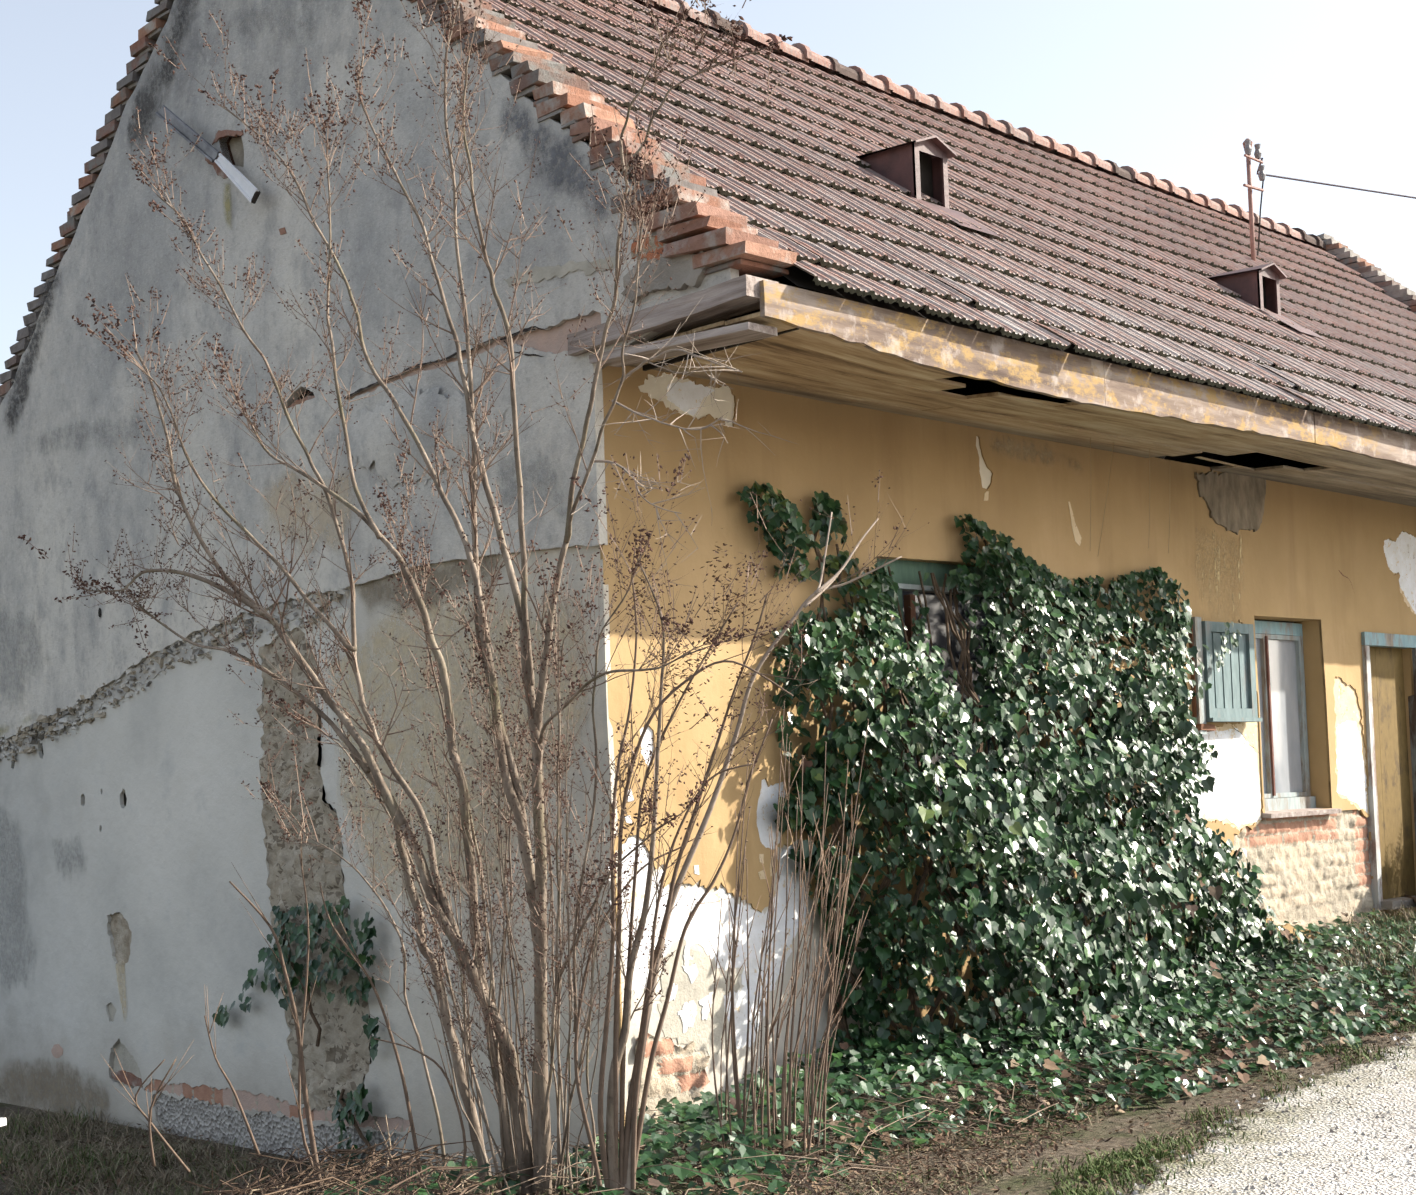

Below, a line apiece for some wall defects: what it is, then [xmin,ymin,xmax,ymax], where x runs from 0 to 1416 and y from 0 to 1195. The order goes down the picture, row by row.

leakage [128,0,196,141]
leakage [7,277,57,427]
peeling [638,373,735,427]
peeling [1383,531,1416,614]
flaking render [1174,677,1374,931]
spalling [0,586,410,1174]
peeling [607,779,883,1136]